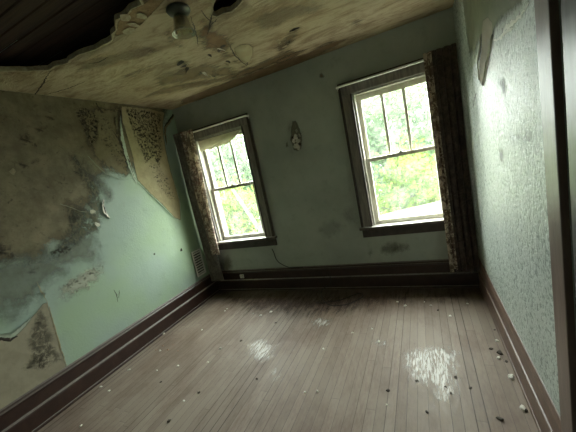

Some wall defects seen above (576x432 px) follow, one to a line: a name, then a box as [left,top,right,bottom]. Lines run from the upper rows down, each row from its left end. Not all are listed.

flaking render [115,0,164,35]
damp [147,30,345,103]
peeling [477,17,493,86]
damp [127,109,174,199]
peeling [0,90,174,317]